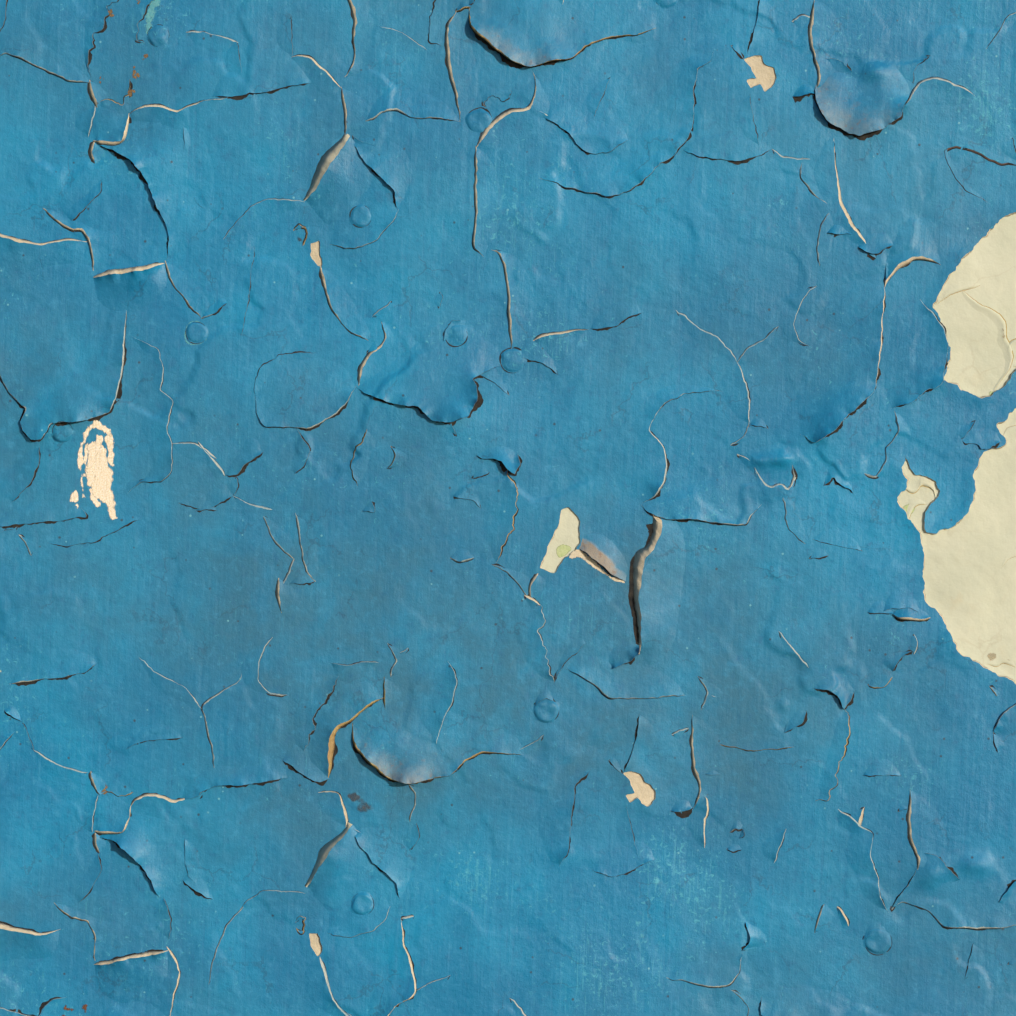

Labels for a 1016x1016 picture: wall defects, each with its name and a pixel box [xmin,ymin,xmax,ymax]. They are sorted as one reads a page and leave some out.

crack [0,0,644,386]
peeling [304,134,412,225]
peeling [744,55,776,91]
crack [731,0,852,103]
crack [676,95,940,559]
peeling [796,212,1016,443]
crack [0,337,319,613]
crack [140,637,458,833]
crack [450,467,809,866]
peeling [623,771,656,807]
peeling [540,384,762,665]
peeling [893,408,1016,684]